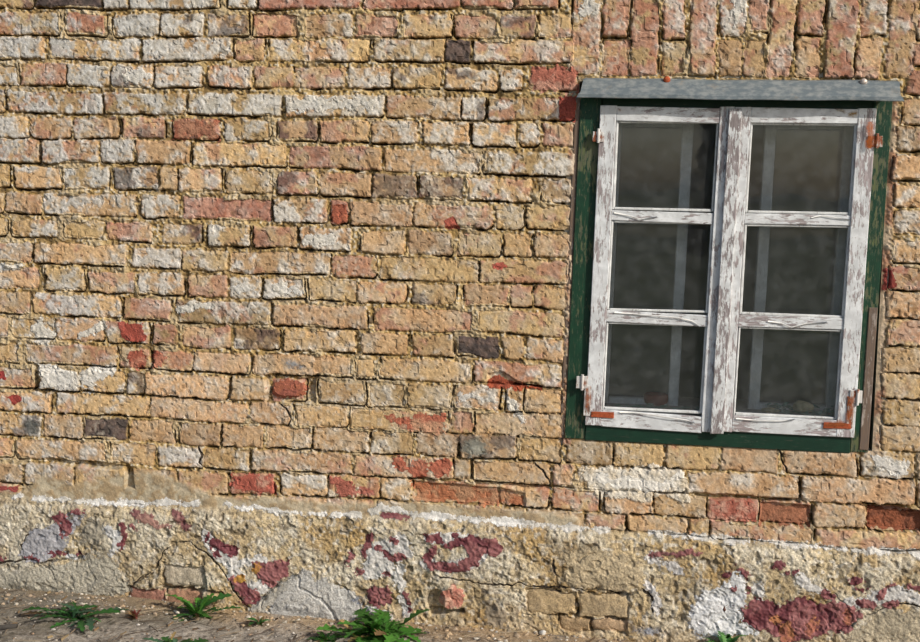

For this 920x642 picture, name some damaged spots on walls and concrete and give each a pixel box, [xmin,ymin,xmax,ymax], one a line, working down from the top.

rust [825,397,854,427]
peeling [18,508,86,563]
peeling [102,508,192,558]
crack [130,541,295,612]
peeling [201,529,291,605]
peeling [344,529,505,621]
peeling [684,560,920,642]